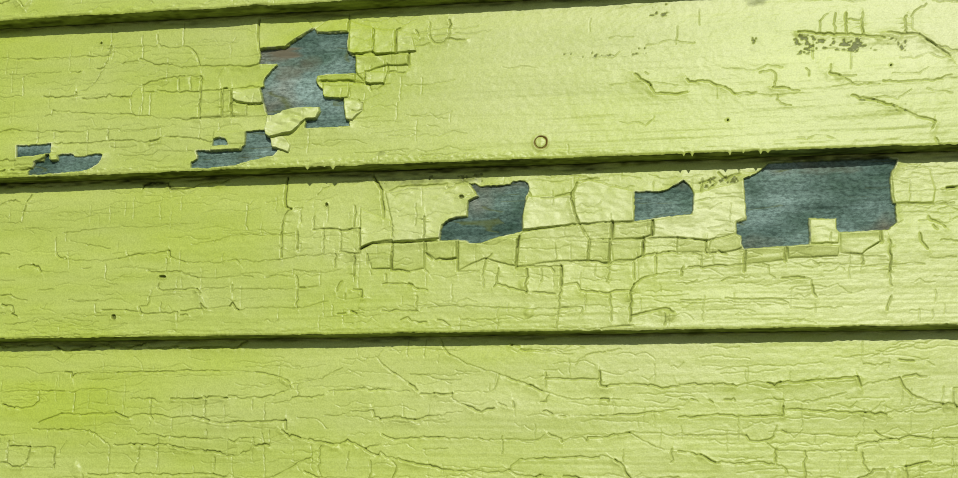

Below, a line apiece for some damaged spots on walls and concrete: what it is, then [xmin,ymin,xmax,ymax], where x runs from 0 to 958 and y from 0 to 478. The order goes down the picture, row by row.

peeling [15,143,102,175]
peeling [190,15,416,169]
crack [321,14,466,112]
peeling [360,157,936,271]
crack [634,0,958,145]
crack [0,158,958,478]